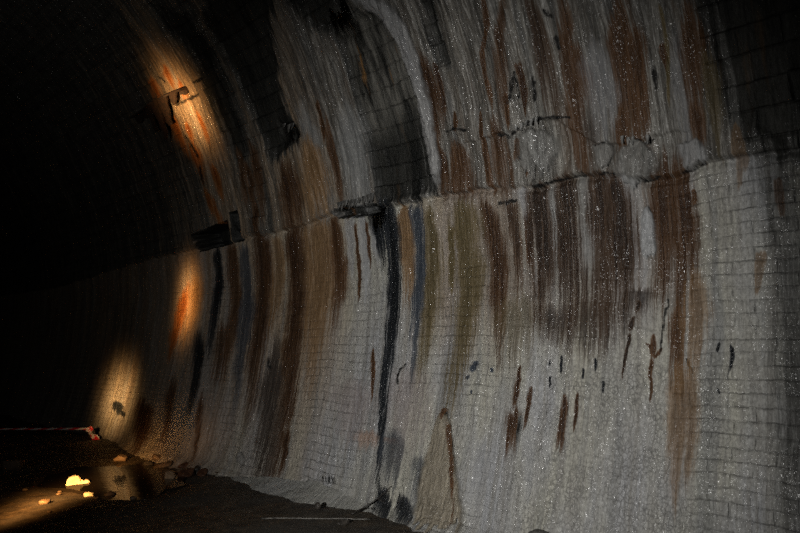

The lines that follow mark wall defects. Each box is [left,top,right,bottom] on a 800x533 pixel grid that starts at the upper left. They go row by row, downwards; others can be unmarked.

rust [171,115,224,224]
spalling [153,6,249,157]
spalling [191,210,245,252]
rust [236,138,372,477]
damp [359,197,426,525]
crack [498,73,570,137]
rust [397,0,708,518]
crack [533,170,660,188]